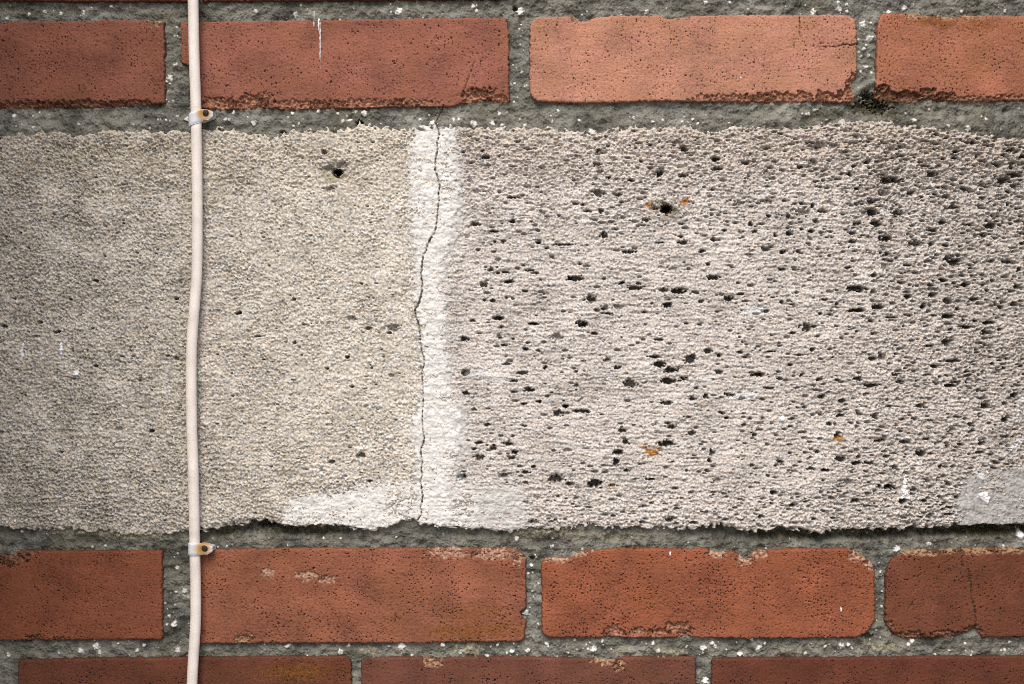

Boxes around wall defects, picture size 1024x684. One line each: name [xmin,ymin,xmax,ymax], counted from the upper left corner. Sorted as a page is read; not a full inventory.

crack [414,70,472,520]